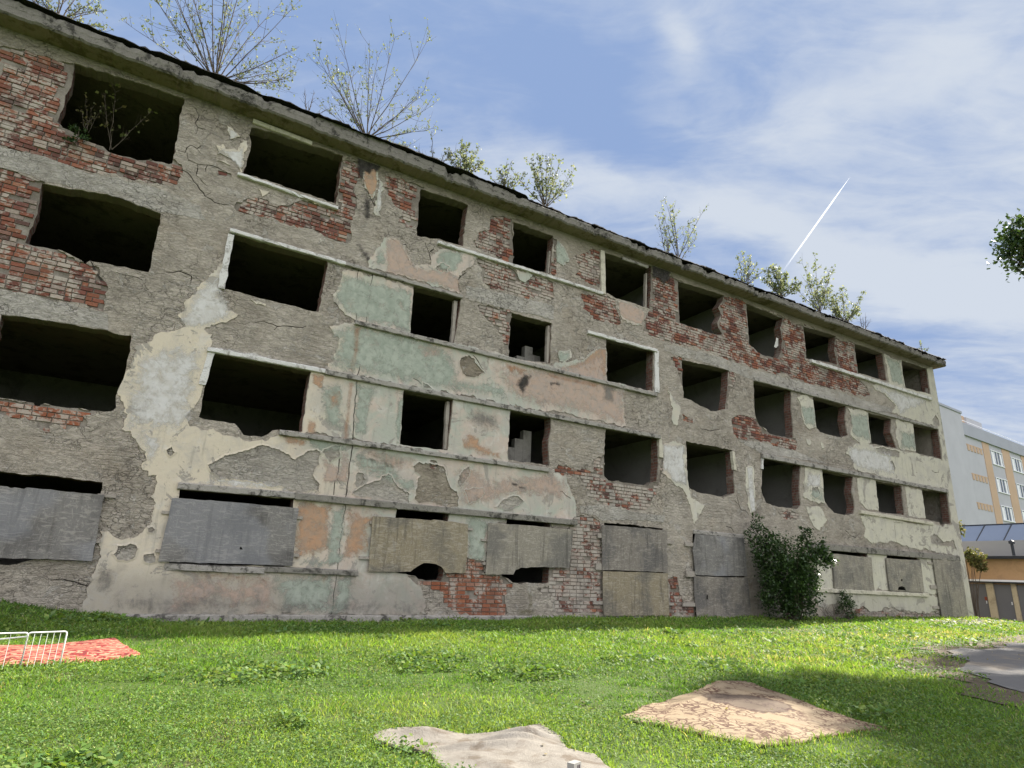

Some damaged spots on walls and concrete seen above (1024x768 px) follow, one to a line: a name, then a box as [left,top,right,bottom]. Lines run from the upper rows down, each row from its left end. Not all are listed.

spalling [0,169,108,311]
spalling [0,47,183,186]
crack [181,110,227,205]
spalling [234,161,424,243]
spalling [0,399,99,434]
spalling [351,216,974,618]
peeling [206,443,342,494]